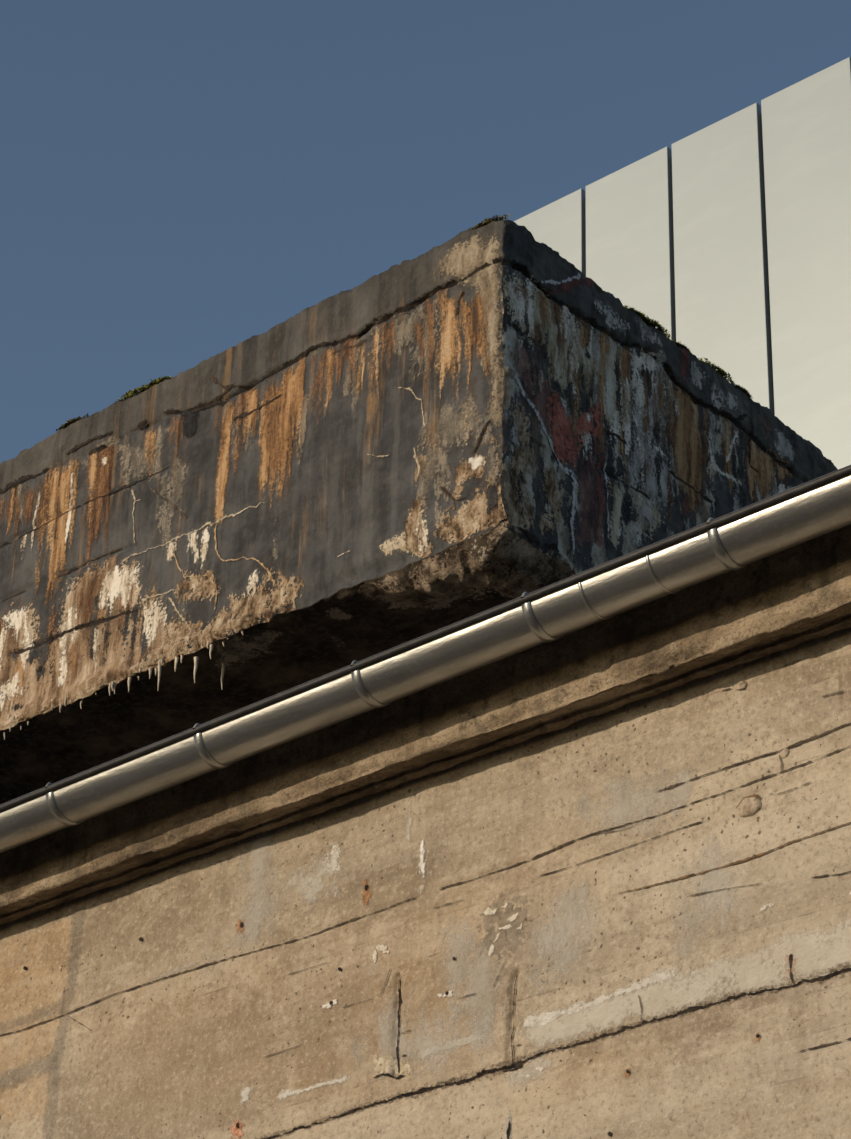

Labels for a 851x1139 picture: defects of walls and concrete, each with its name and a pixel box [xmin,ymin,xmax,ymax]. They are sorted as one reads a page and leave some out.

rust [1,446,112,605]
leakage [0,564,281,740]
peeling [117,442,187,542]
leakage [167,527,210,567]
rust [214,320,394,522]
rust [414,290,491,398]
leakage [357,523,576,611]
peeling [371,235,674,558]
rust [534,290,792,521]
peeling [690,361,743,442]
crack [0,723,851,1036]
crack [262,959,851,1139]